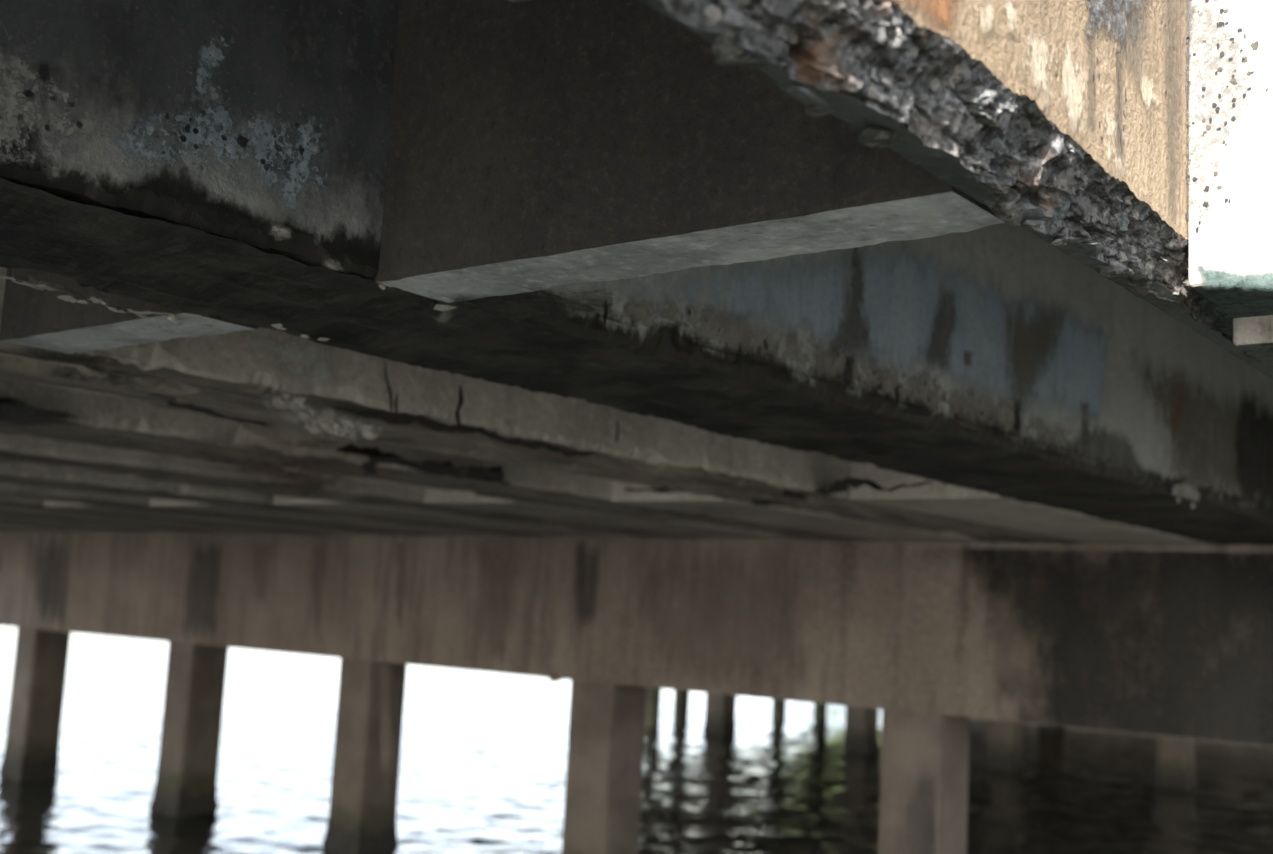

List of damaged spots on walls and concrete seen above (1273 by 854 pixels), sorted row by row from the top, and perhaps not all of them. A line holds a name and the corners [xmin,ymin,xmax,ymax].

damp [0,0,400,242]
spalling [271,226,290,237]
spalling [661,0,1268,365]
damp [1027,0,1192,205]
spalling [433,304,457,315]
crack [332,359,619,485]
damp [687,247,1273,511]
crack [622,488,679,504]
crack [751,477,937,506]